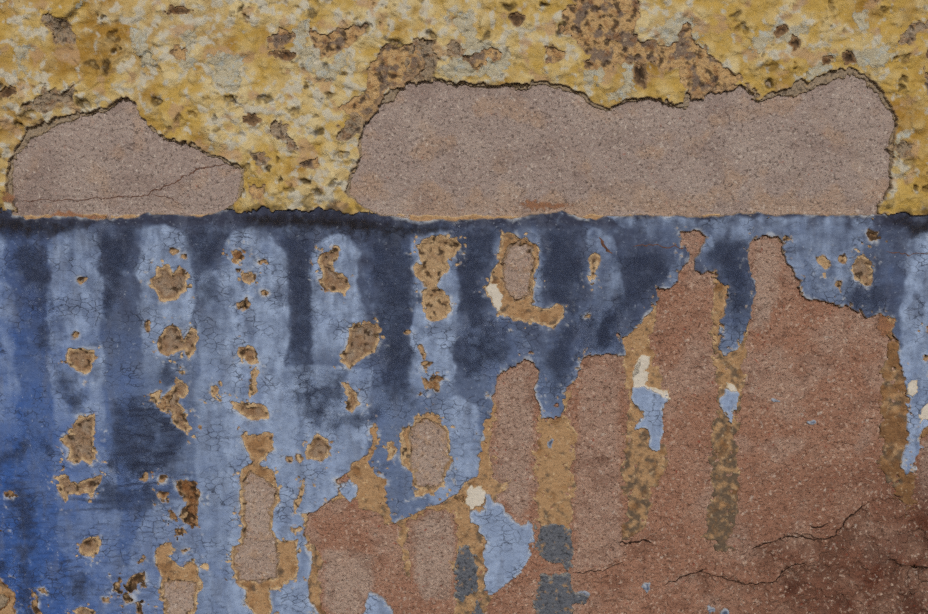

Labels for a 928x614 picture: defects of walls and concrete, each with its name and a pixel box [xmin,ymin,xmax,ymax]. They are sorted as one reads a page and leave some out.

peeling [267,19,368,82]
flaking render [7,83,266,220]
flaking render [337,0,928,221]
peeling [51,414,107,503]
leakage [114,403,183,477]
peeling [144,320,202,442]
leakage [306,381,341,415]
flaking render [222,228,928,614]
peeling [102,472,209,614]
crack [574,539,651,574]
crack [665,563,806,585]
crack [751,505,865,551]